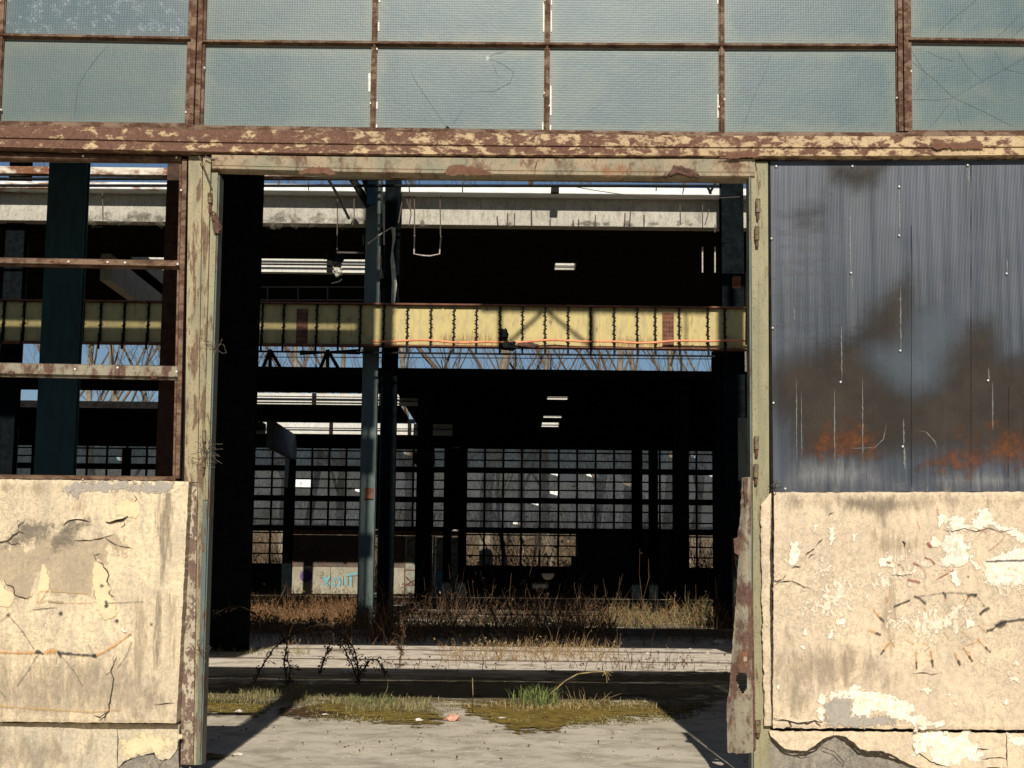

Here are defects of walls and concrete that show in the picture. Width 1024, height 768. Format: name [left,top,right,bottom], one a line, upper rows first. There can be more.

corrosion [930,140,984,150]
spalling [62,477,175,519]
crack [63,495,137,599]
peeling [0,580,15,608]
peeling [36,561,50,604]
peeling [91,561,117,620]
peeling [767,507,1024,658]
peeling [811,684,984,768]
peeling [1005,731,1024,749]